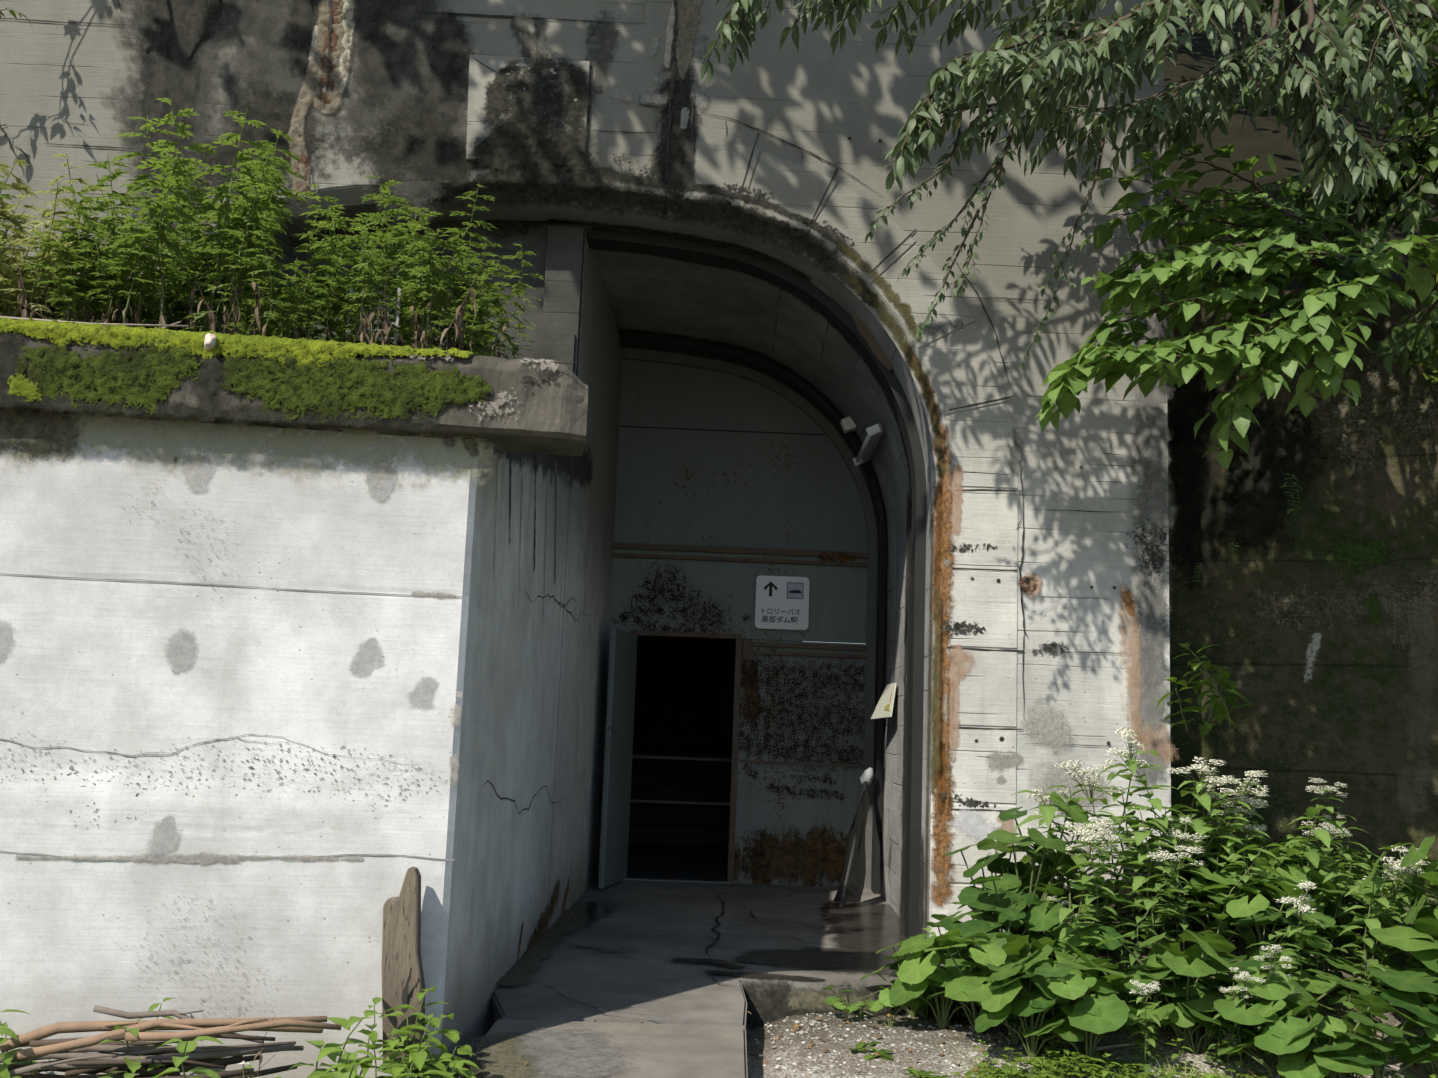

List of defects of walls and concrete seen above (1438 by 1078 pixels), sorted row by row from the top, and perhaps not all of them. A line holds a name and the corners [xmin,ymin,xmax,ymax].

water stain [110,0,615,246]
water stain [648,34,709,197]
water stain [1130,149,1176,345]
water stain [520,358,559,379]
water stain [0,387,592,591]
water stain [412,591,456,599]
water stain [672,287,973,1013]
rust [904,352,963,907]
rust [1120,585,1173,763]
water stain [1126,356,1328,783]
crack [704,886,838,986]
rust [727,826,848,886]